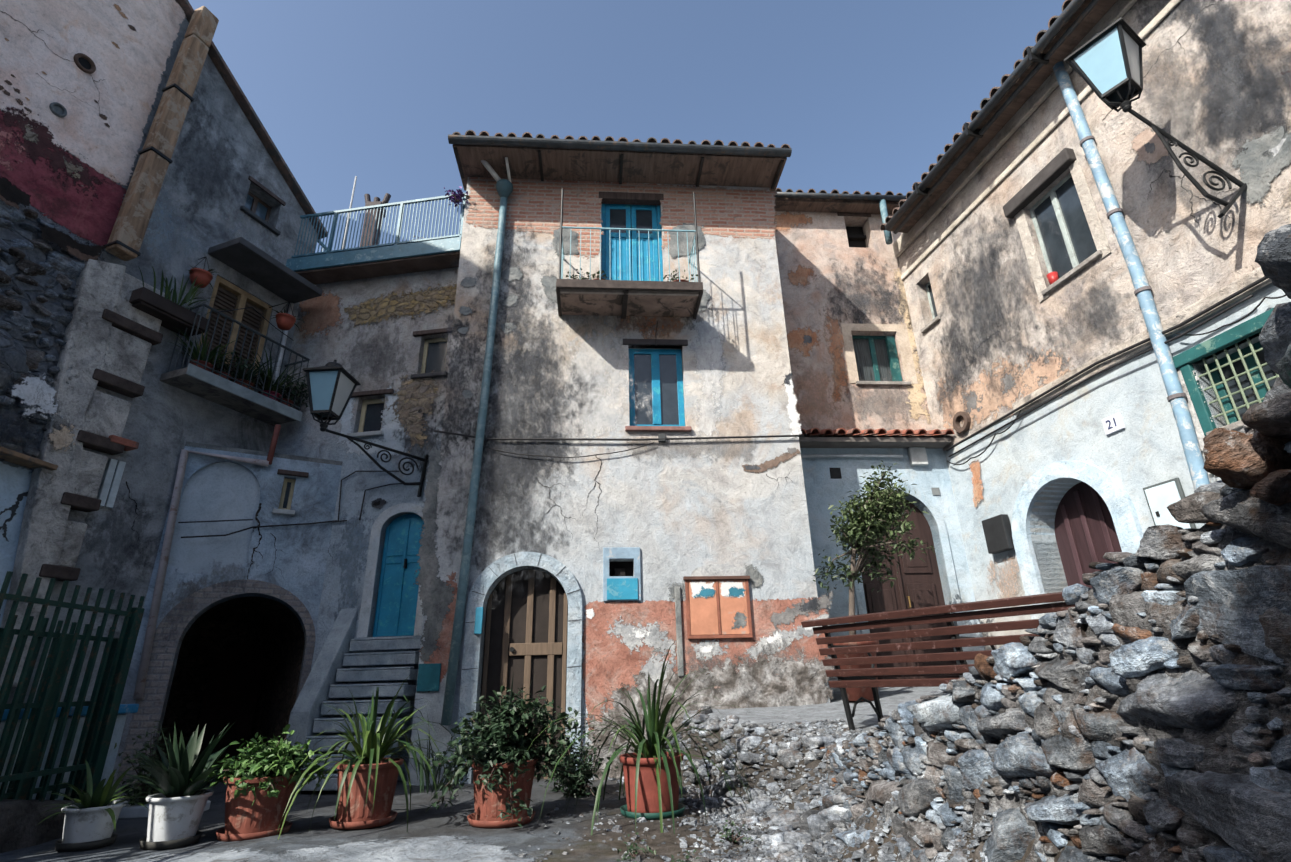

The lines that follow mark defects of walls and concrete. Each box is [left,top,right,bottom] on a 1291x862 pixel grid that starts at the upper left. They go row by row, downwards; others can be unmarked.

spalling [73,53,96,74]
peeling [0,74,115,209]
water stain [1131,0,1291,225]
peeling [787,326,821,357]
water stain [936,218,1036,412]
water stain [1047,287,1119,358]
peeling [11,371,78,451]
water stain [393,230,592,571]
crack [0,492,28,542]
crack [247,503,283,580]
peeling [586,608,730,688]
peeling [745,591,833,662]